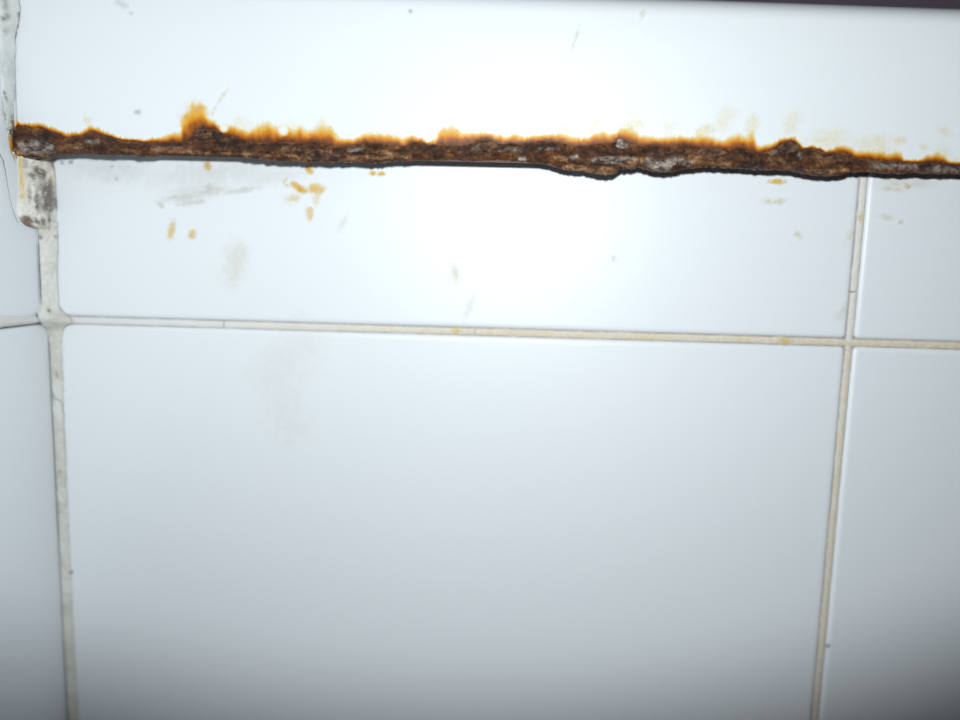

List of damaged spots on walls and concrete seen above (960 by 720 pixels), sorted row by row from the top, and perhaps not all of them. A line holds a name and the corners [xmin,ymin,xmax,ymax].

rust [8,103,960,198]